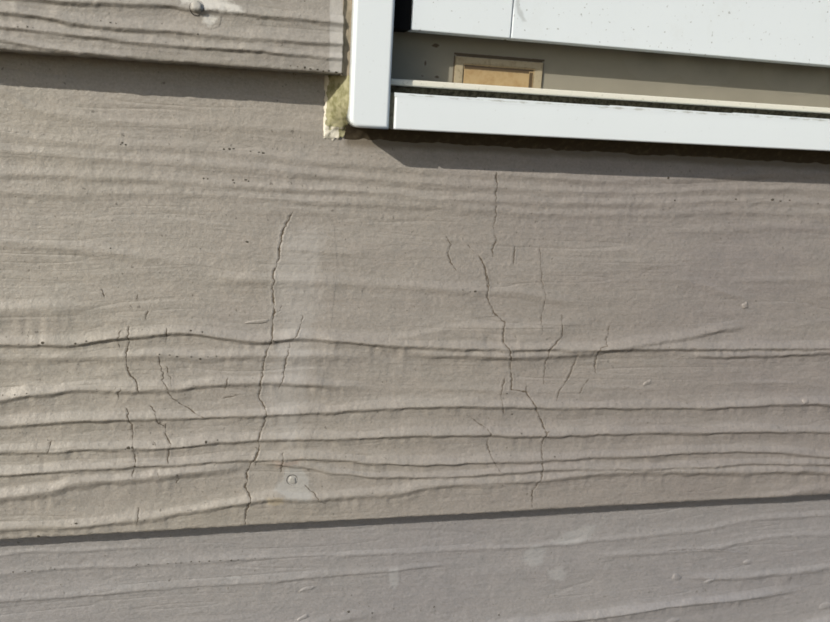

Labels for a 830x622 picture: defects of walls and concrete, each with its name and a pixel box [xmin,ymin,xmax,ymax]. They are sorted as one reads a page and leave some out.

crack [116,294,179,483]
crack [158,357,204,418]
crack [244,213,303,524]
crack [446,172,609,499]